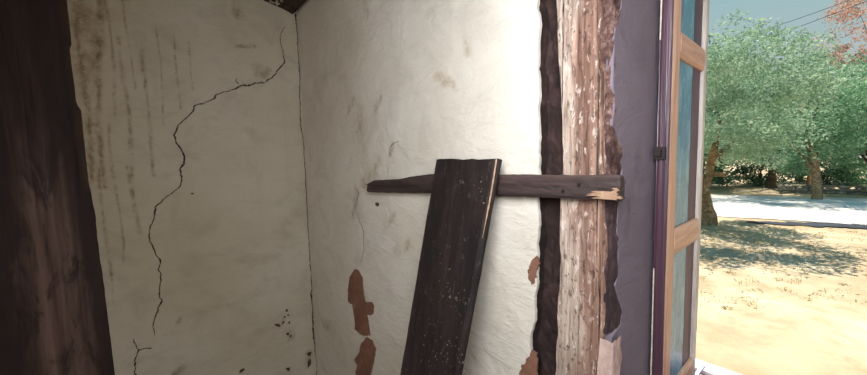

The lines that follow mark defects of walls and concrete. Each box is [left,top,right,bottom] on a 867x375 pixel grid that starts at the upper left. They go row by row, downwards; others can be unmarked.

crack [133,11,317,375]
flaking render [348,268,376,375]
flaking render [519,349,538,375]
flaking render [527,256,541,284]